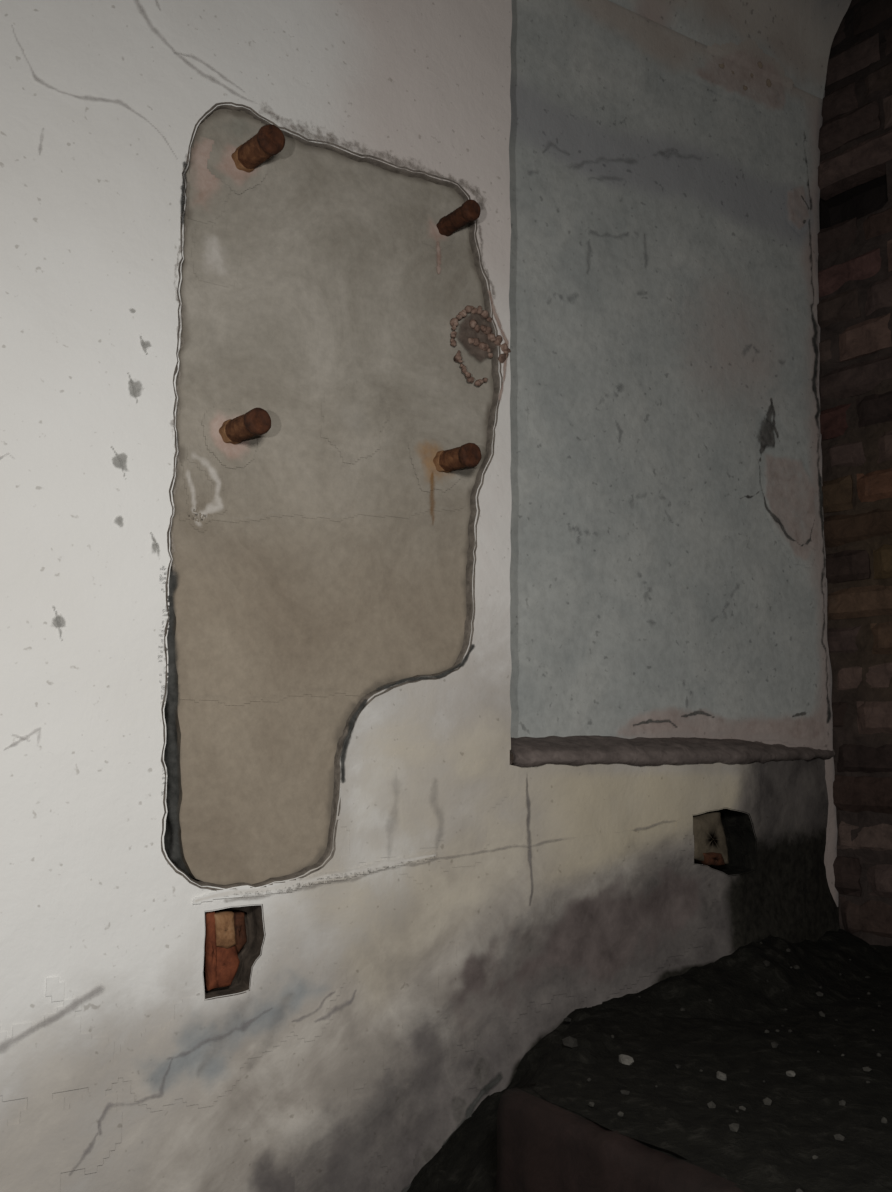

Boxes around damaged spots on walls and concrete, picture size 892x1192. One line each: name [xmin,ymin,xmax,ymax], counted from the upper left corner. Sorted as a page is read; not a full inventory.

corrosion [207,135,268,195]
corrosion [202,405,257,469]
flaking render [152,102,511,891]
corrosion [408,432,461,492]
flaking render [740,398,822,568]
crack [193,852,449,904]
leakage [337,744,507,884]
crack [498,783,547,904]
crack [0,988,101,1050]
leakage [0,948,347,1192]
spalling [203,904,266,1000]
leakage [182,821,721,1192]